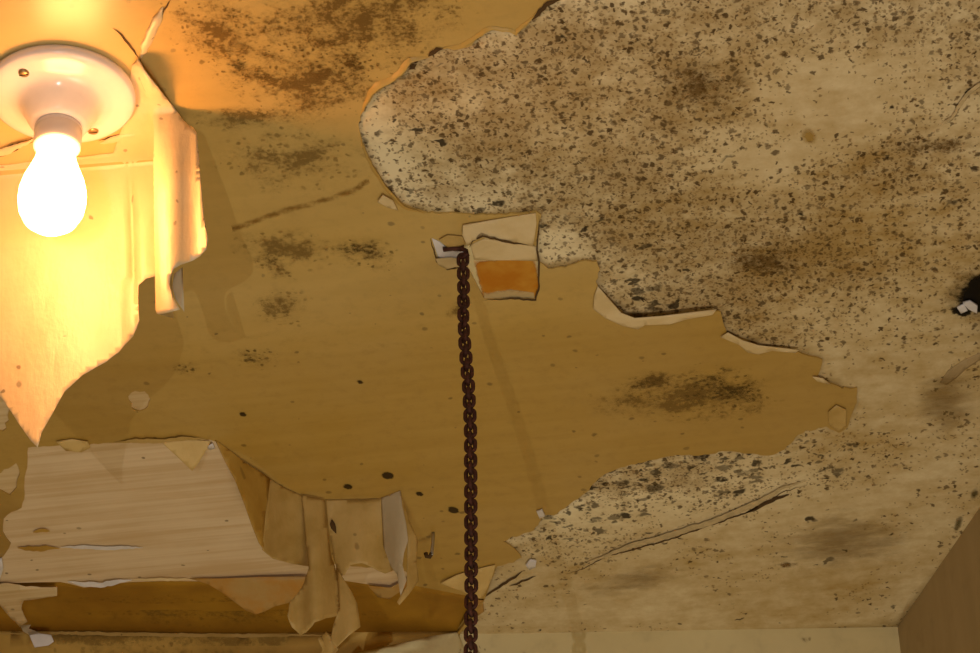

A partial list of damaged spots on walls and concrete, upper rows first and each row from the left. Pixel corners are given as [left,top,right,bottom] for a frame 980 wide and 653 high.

crack [0,139,33,157]
peeling [0,58,419,653]
mould [193,0,425,110]
peeling [359,0,980,634]